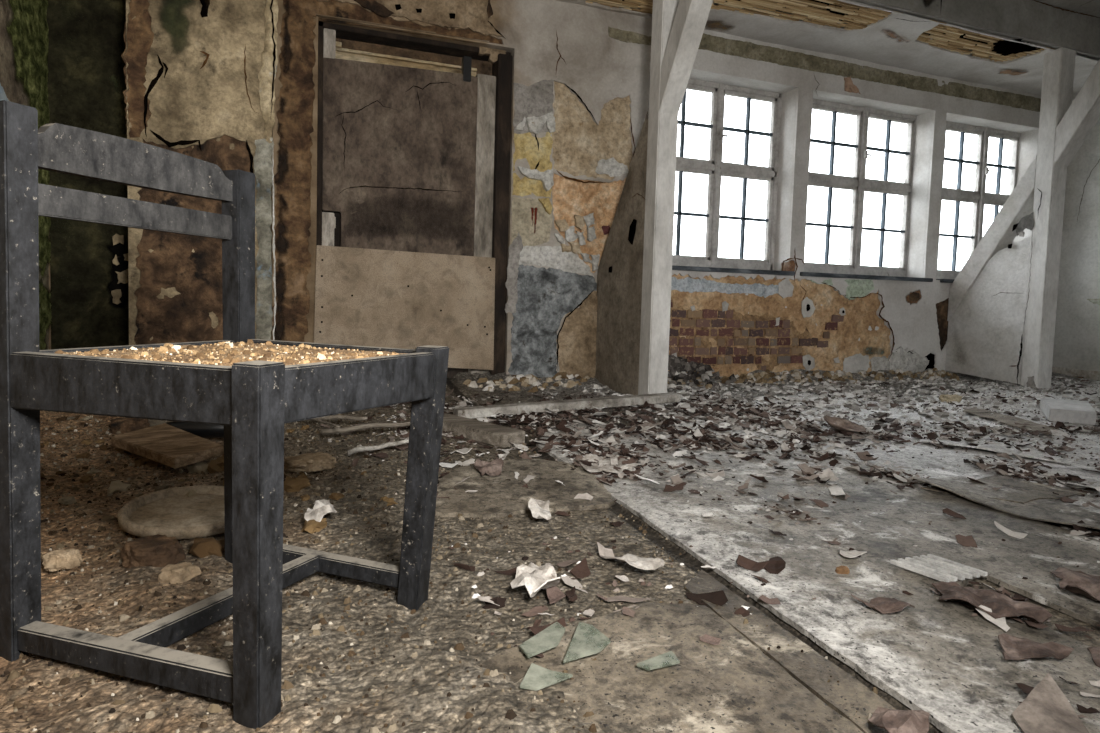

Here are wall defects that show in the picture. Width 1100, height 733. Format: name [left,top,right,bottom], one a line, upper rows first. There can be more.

spalling [585,0,653,14]
spalling [711,0,902,30]
spalling [917,19,1055,62]
crack [144,54,201,150]
crack [245,140,253,173]
crack [335,82,457,194]
spalling [504,80,637,313]
spalling [1008,212,1034,248]
spalling [669,274,949,377]